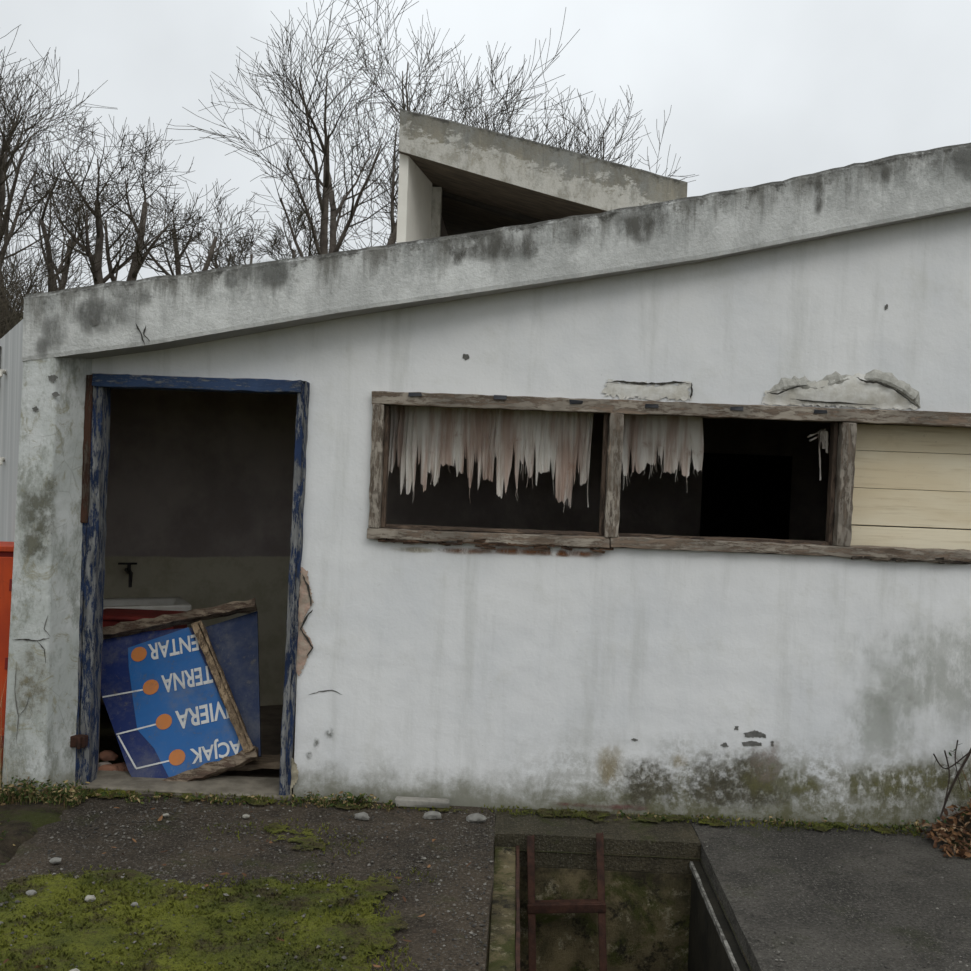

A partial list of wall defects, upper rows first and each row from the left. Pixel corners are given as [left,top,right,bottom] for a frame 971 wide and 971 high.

water stain [24,478,55,555]
crack [15,616,50,662]
spalling [296,567,314,676]
peeling [734,726,774,747]
water stain [695,780,731,801]
water stain [741,749,818,803]
water stain [850,777,899,797]